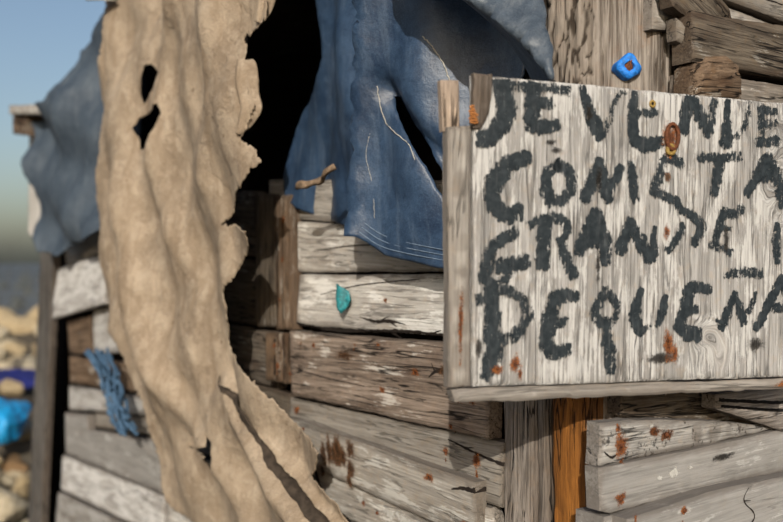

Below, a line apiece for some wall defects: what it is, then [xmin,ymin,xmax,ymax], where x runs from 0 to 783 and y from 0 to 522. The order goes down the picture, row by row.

rust [615,423,628,463]